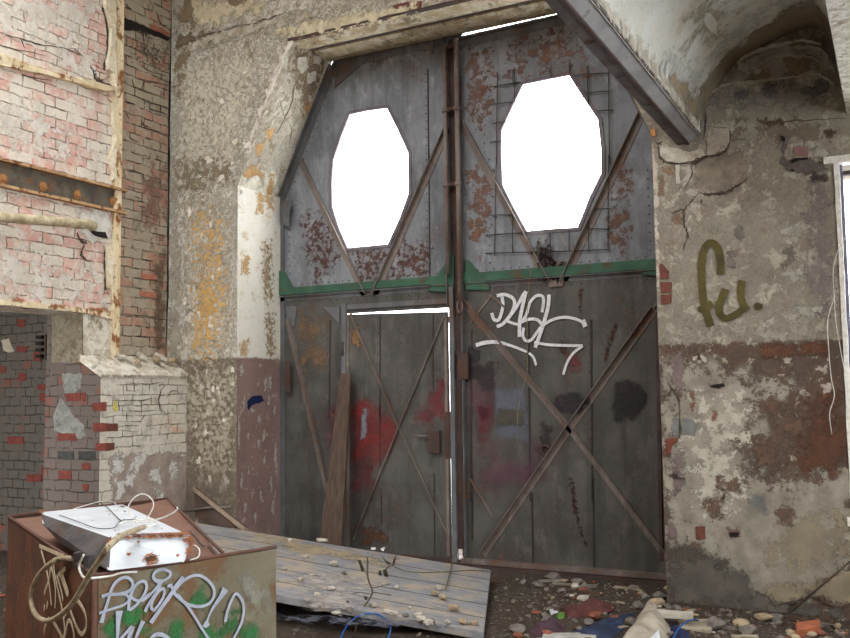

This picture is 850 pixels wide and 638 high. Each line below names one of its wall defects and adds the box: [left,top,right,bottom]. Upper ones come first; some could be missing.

crack [0,32,84,57]
rust [464,24,584,131]
peeling [57,0,422,516]
rust [299,210,435,290]
rust [605,169,635,255]
crack [655,141,703,250]
crack [703,110,732,139]
crack [764,118,845,130]
flaking render [780,135,829,183]
peeling [659,342,850,608]